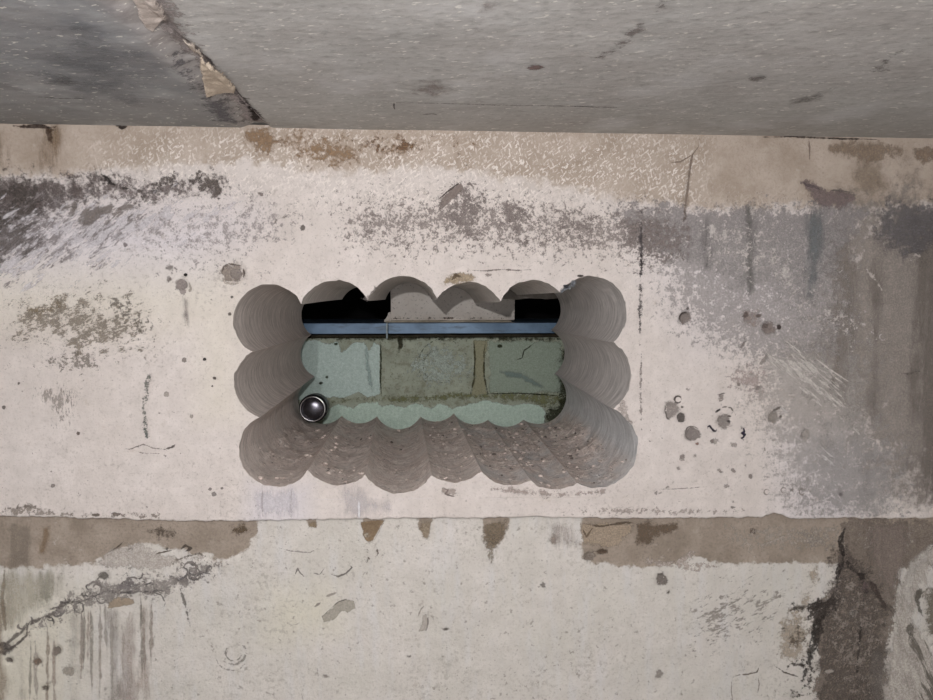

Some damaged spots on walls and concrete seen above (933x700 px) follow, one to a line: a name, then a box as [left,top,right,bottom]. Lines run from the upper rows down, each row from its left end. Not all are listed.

rust [245,127,413,167]
leakage [0,169,311,375]
leakage [607,178,933,700]
spalling [361,520,384,562]
spalling [419,522,431,538]
spalling [579,506,744,560]
crack [0,553,210,655]
peeling [314,592,355,622]